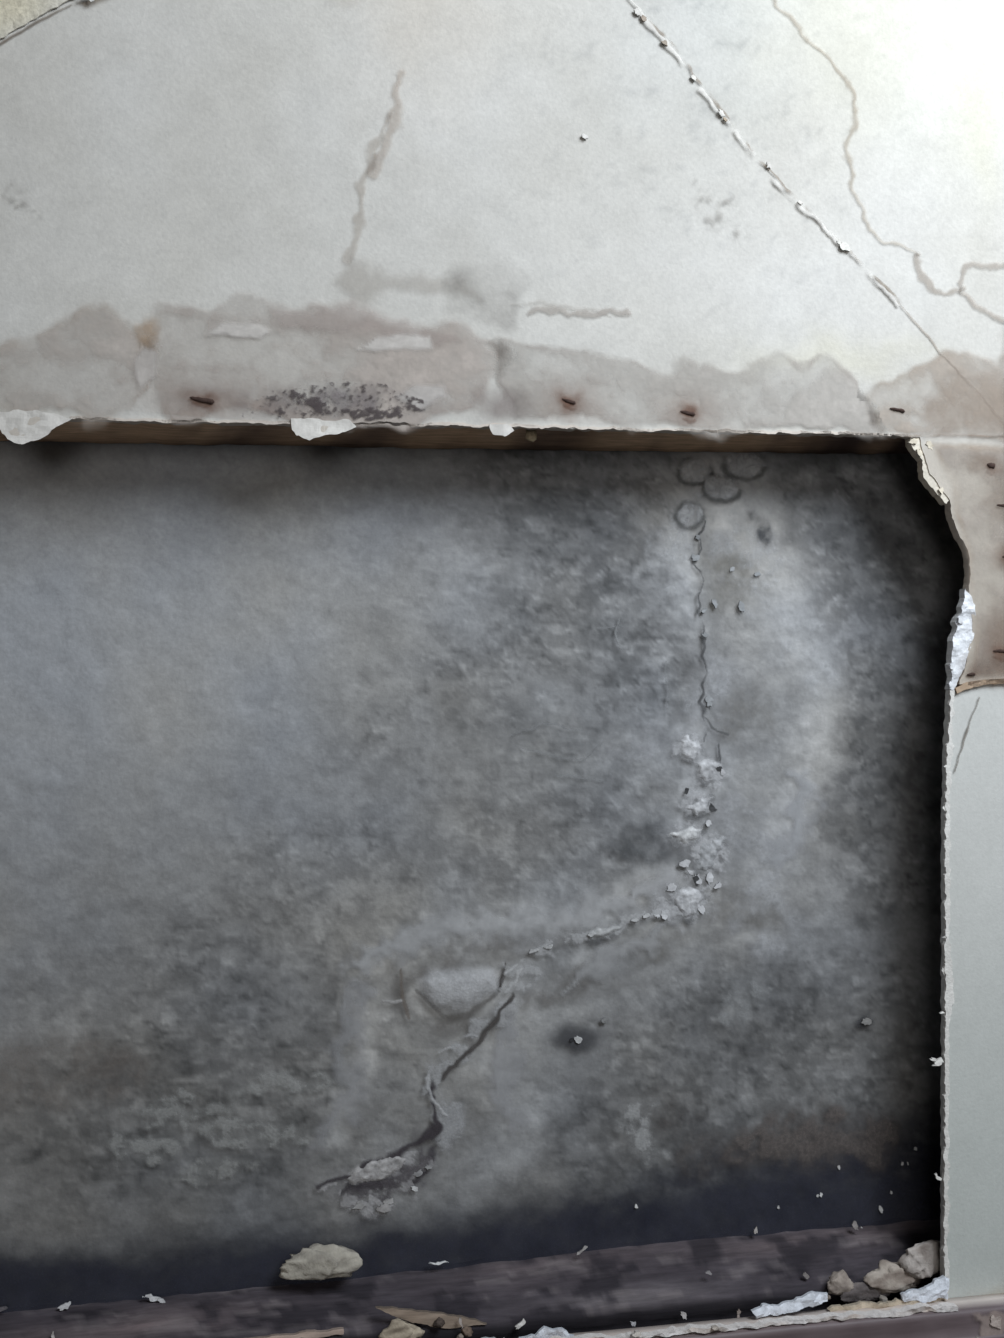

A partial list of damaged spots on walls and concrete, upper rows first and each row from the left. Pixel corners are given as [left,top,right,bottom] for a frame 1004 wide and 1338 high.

crack [630,0,1004,437]
damp [38,309,153,381]
damp [169,405,207,422]
damp [251,309,1004,492]
spalling [905,438,949,505]
crack [691,520,761,764]
spalling [945,588,976,691]
damp [109,871,681,1185]
crack [316,963,523,1189]
spalling [320,734,729,1219]
damp [0,1103,941,1313]
spalling [549,1302,958,1338]